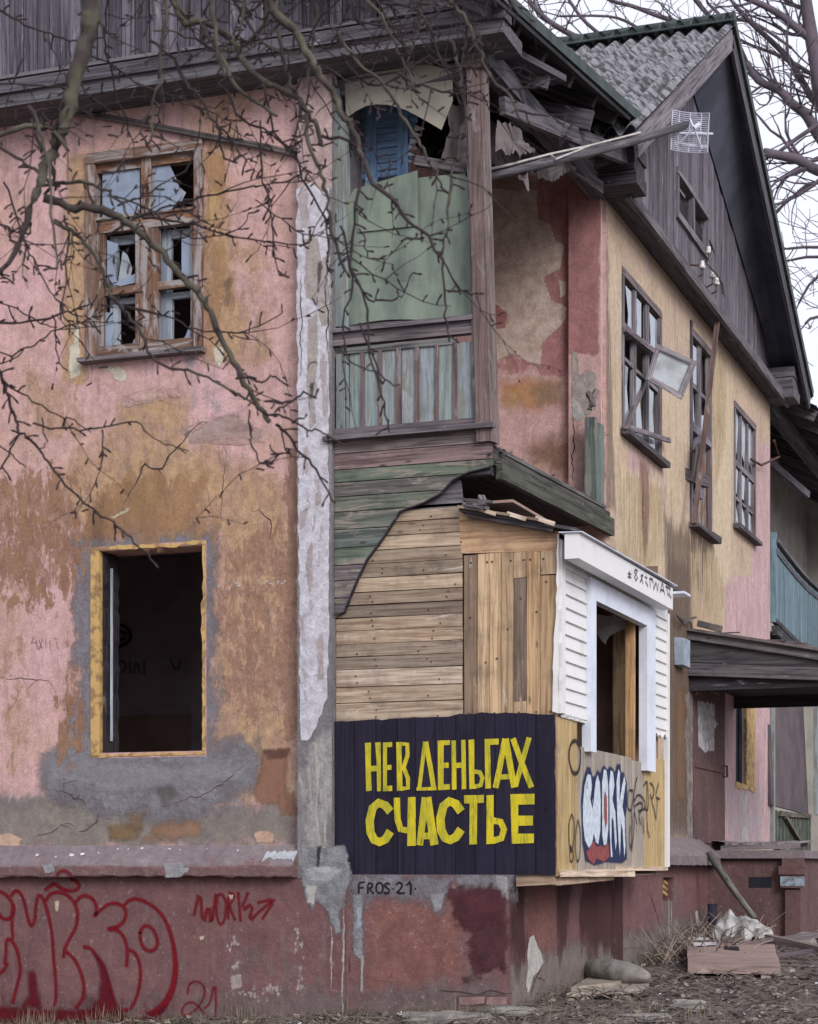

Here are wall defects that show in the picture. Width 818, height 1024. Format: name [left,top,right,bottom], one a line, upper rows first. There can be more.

flaking render [492,188,568,367]
flaking render [571,350,597,422]
peeling [0,459,96,620]
peeling [266,183,330,820]
peeling [50,690,85,772]
crack [33,780,98,837]
crack [161,761,249,807]
flaking render [254,831,274,843]